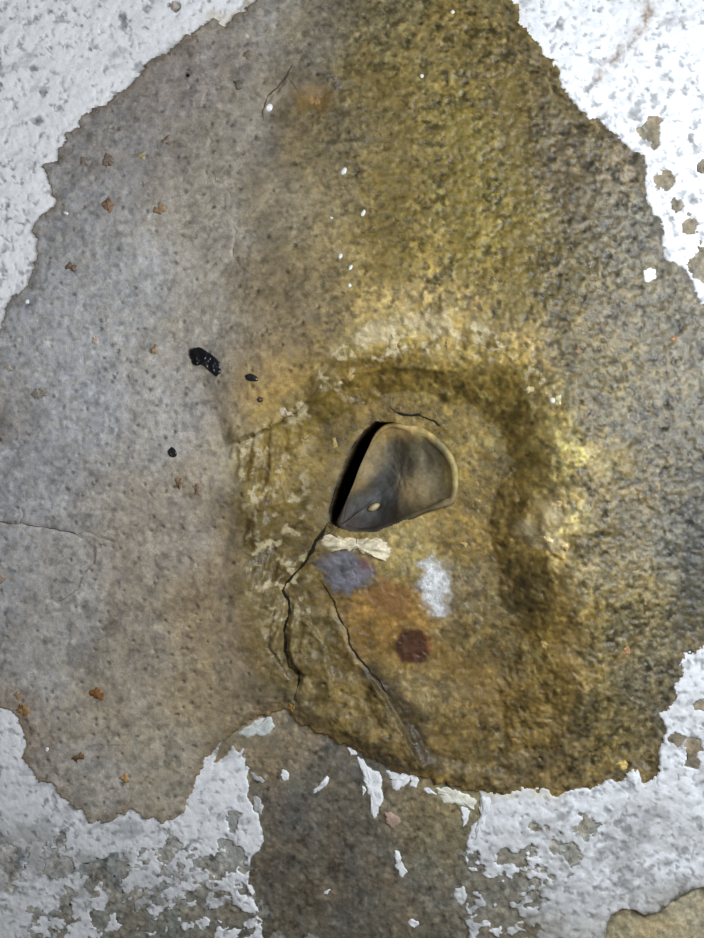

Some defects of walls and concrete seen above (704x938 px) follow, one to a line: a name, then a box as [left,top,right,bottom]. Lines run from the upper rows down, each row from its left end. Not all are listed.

spalling [490,0,704,306]
spalling [0,0,549,938]
water stain [252,524,300,555]
water stain [256,556,303,592]
crack [238,380,324,515]
crack [268,522,391,697]
corrosion [219,305,584,781]
crack [389,406,441,427]
water stain [267,0,704,787]
spalling [285,277,704,797]
peeling [521,813,603,878]
peeling [605,888,704,938]